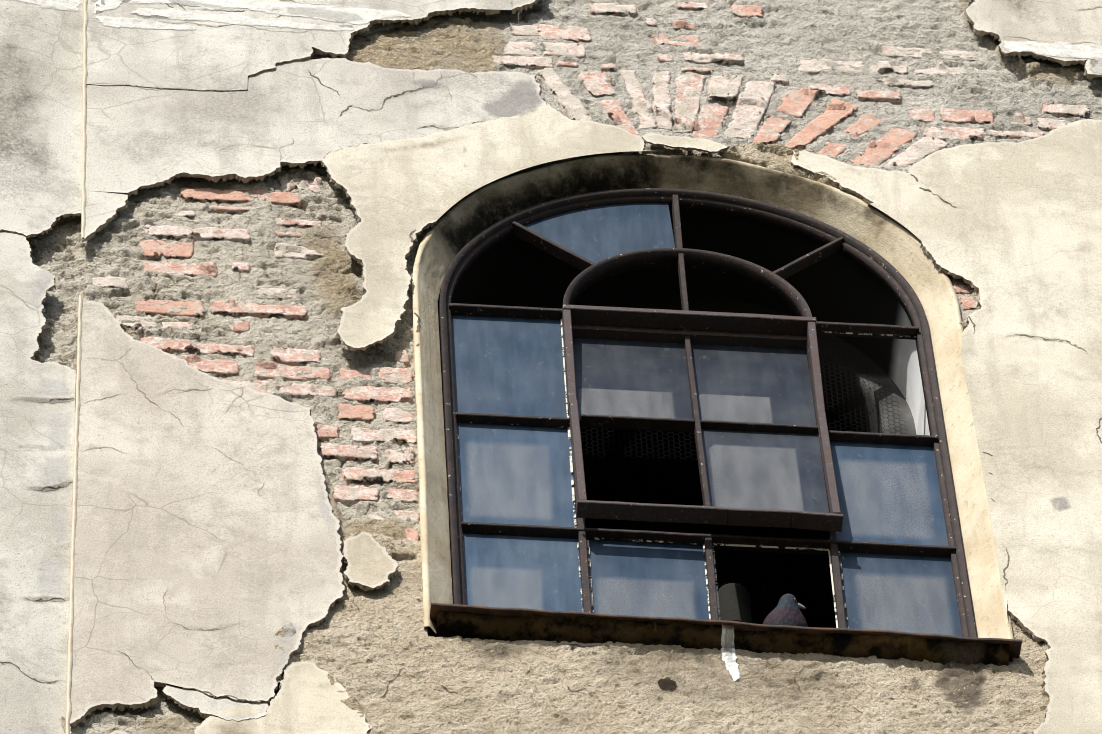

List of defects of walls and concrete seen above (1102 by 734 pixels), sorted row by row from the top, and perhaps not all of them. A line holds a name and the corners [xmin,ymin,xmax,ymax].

peeling [19,0,81,11]
crack [308,70,476,115]
spalling [94,0,1102,201]
crack [49,348,243,426]
spalling [27,126,1049,734]
crack [1002,546,1010,591]
crack [203,691,268,703]